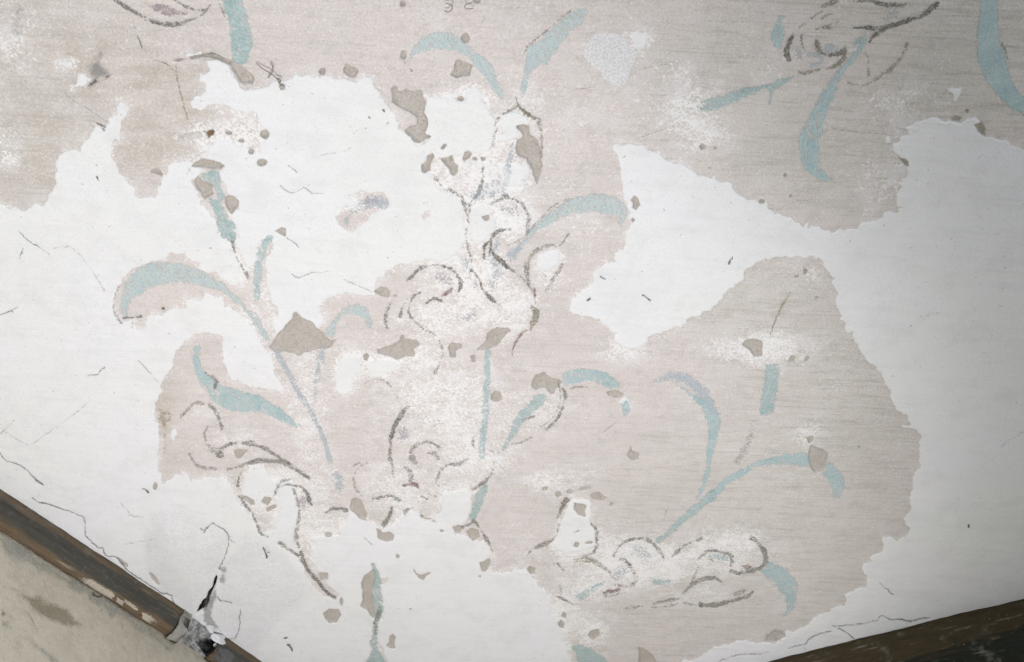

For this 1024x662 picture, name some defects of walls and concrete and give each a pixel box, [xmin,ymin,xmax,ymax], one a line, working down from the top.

peeling [0,0,269,243]
spalling [391,85,431,146]
peeling [497,112,529,141]
peeling [468,207,496,244]
peeling [537,250,560,271]
peeling [113,239,278,334]
spalling [269,312,336,356]
peeling [334,355,363,395]
peeling [366,360,397,373]
crack [2,456,241,638]
peeling [556,499,597,554]
spalling [179,617,217,658]